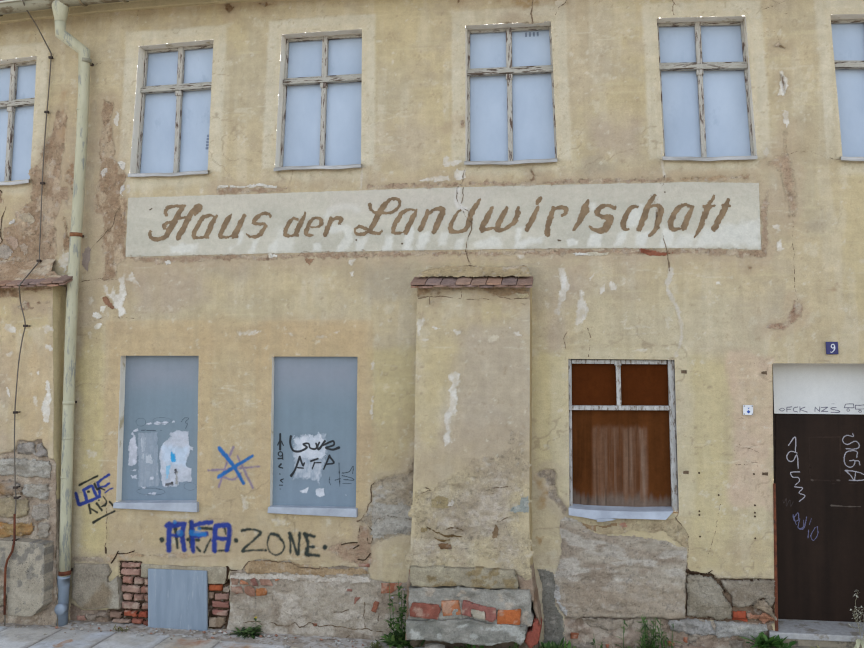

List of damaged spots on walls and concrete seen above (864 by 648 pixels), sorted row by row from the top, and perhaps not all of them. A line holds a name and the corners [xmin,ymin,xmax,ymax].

flaking render [0,110,74,273]
flaking render [87,99,785,342]
crack [456,170,473,266]
flaking render [767,110,798,218]
crack [418,292,527,304]
peeling [442,371,462,447]
flaking render [0,439,58,625]
peeling [148,511,200,522]
flaking render [328,430,568,580]
flaking render [581,518,688,548]
flaking render [69,547,214,626]